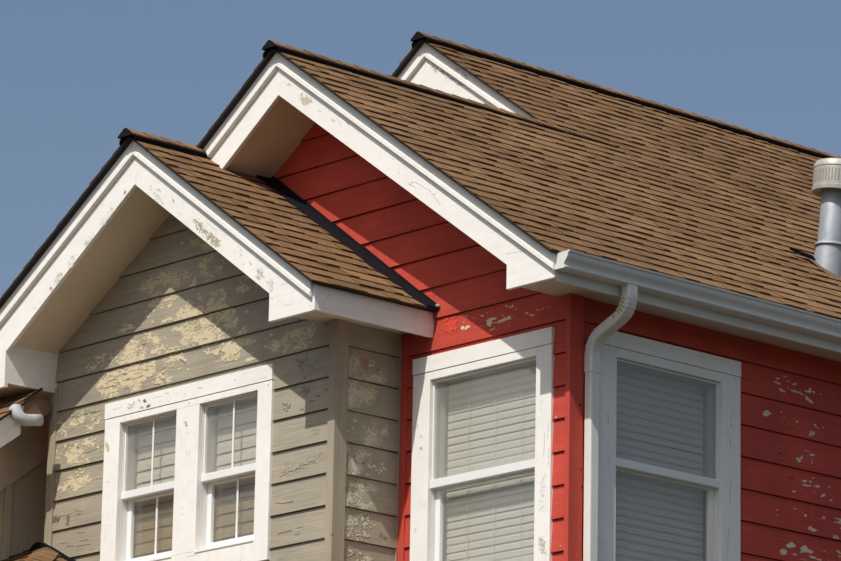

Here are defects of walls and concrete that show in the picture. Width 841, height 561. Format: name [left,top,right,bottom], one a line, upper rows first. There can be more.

peeling [55,234,316,493]
peeling [347,356,389,409]
peeling [774,376,822,404]
peeling [344,419,389,561]
peeling [780,542,841,561]